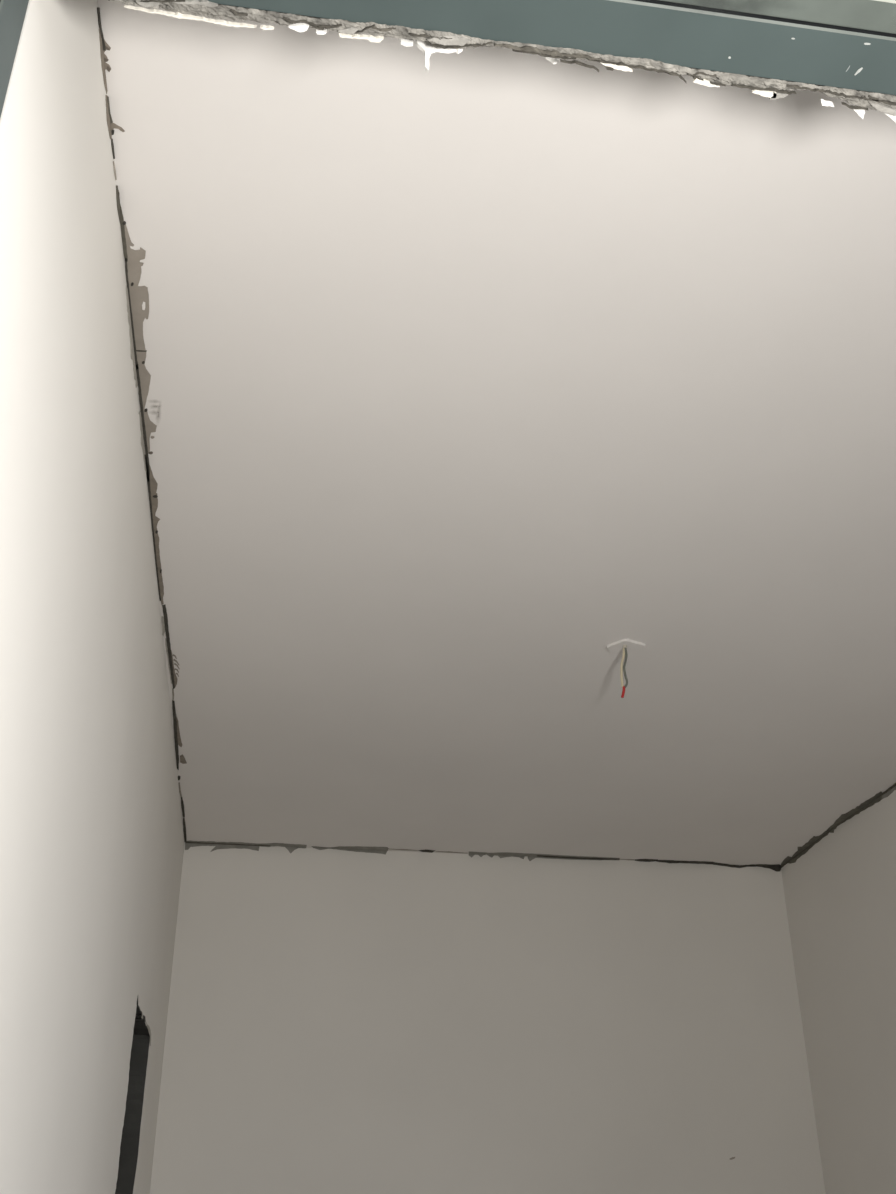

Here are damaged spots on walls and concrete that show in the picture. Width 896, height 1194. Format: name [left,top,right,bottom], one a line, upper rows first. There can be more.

peeling [99,28,125,140]
peeling [122,221,179,687]
crack [390,783,896,872]